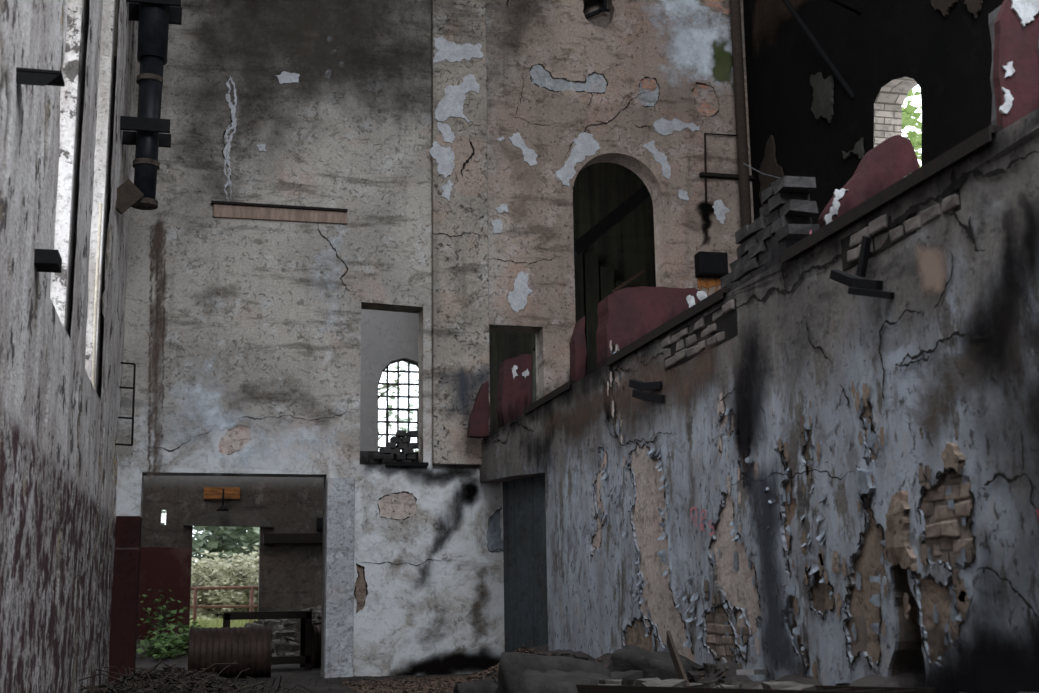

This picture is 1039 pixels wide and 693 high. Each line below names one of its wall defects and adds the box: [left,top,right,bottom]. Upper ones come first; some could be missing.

peeling [1011,0,1039,27]
peeling [999,61,1015,114]
crack [222,76,237,201]
crack [317,223,351,299]
crack [735,254,842,309]
crack [870,151,1039,416]
crack [804,322,850,406]
flaking render [378,491,417,520]
peeling [590,341,889,682]
flaking render [354,563,368,613]
damp [470,571,488,634]
flaking render [903,463,976,661]